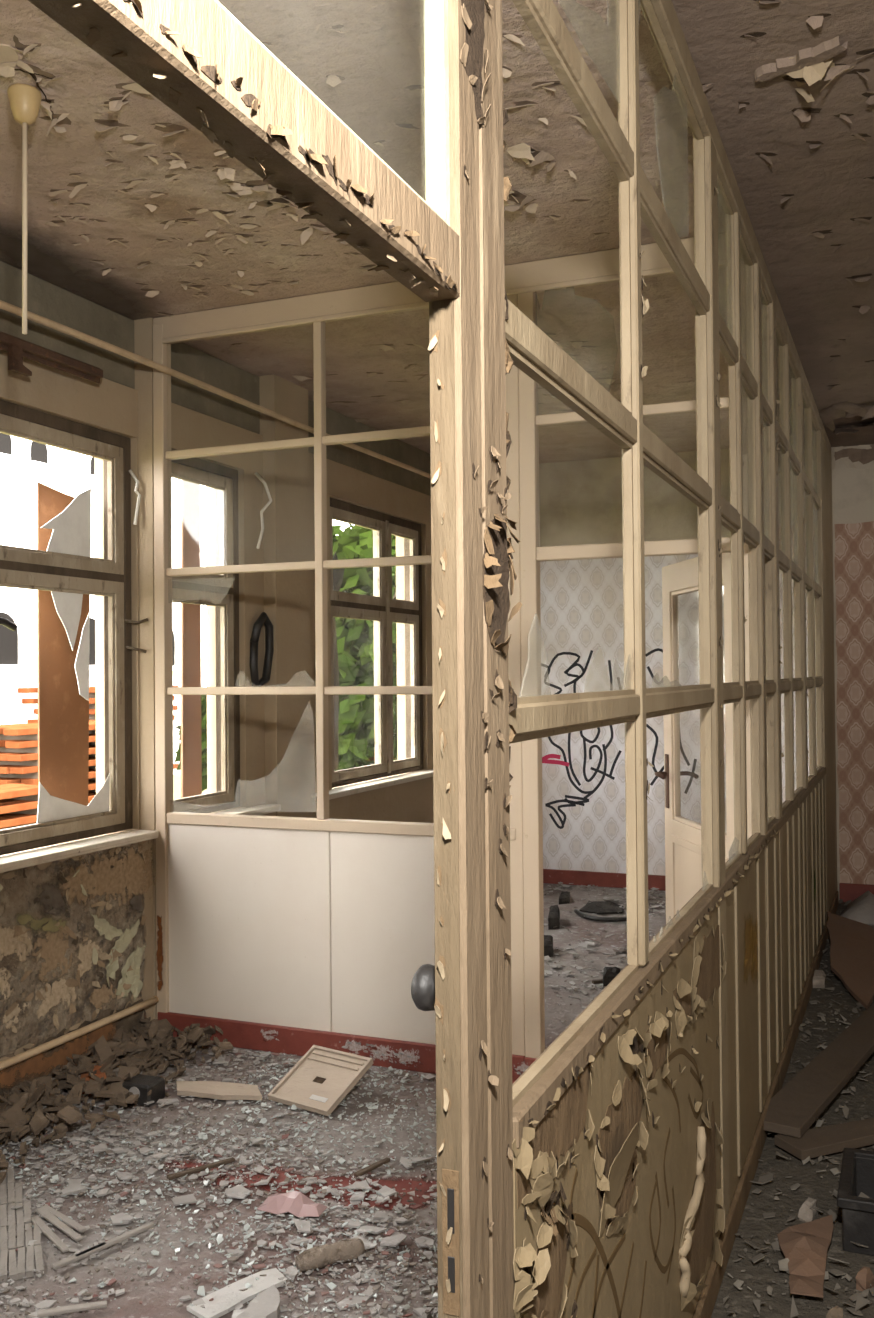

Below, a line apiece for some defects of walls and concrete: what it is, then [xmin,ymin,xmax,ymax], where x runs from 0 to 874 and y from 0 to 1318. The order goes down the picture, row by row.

peeling [123,0,143,19]
peeling [159,24,261,111]
peeling [806,13,831,29]
peeling [782,48,874,141]
peeling [44,173,129,276]
peeling [94,72,457,298]
peeling [504,177,561,220]
peeling [481,669,517,857]
flaking render [0,840,155,1103]
peeling [339,1039,424,1067]
peeling [479,1040,499,1086]
peeling [506,830,779,1318]